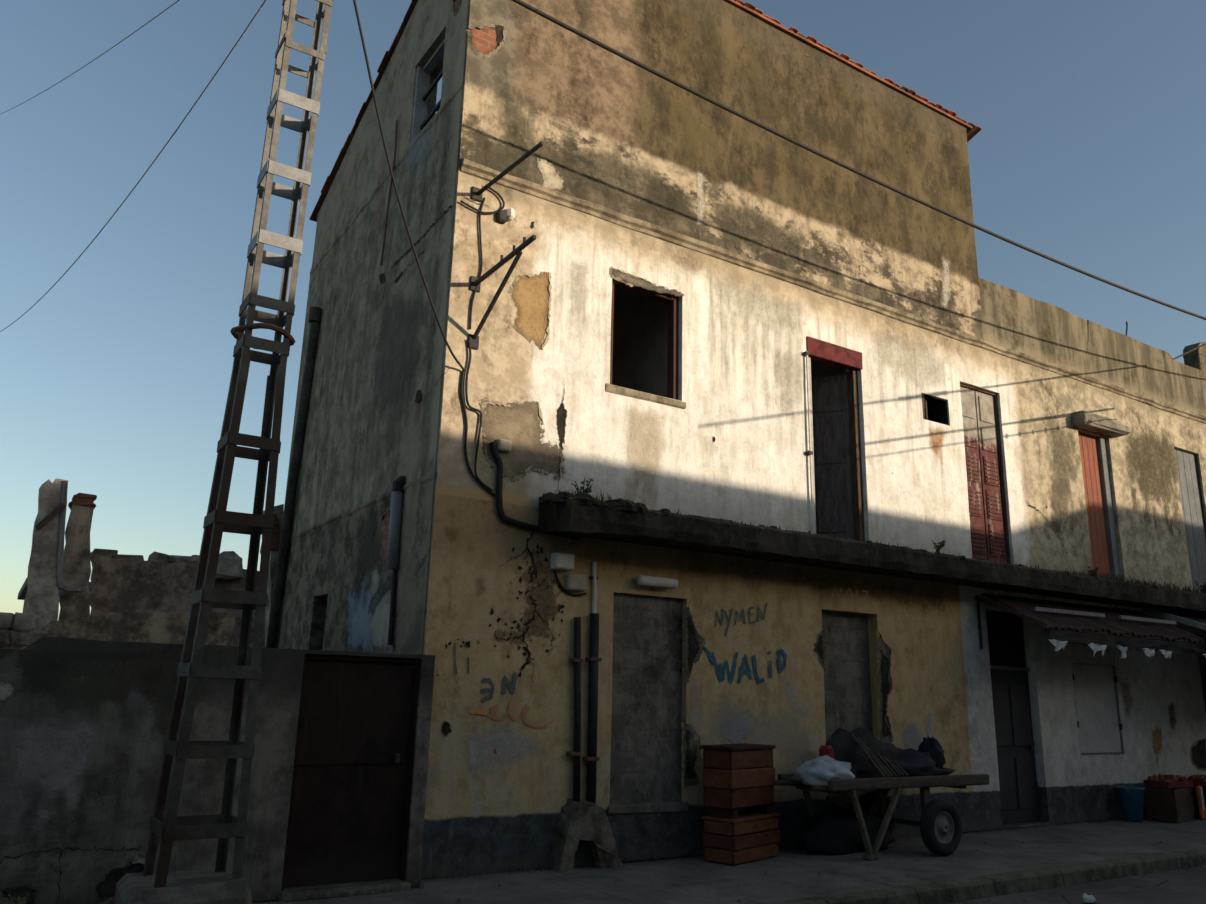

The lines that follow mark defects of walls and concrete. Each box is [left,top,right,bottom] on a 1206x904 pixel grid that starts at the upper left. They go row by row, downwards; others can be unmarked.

spalling [466,23,507,59]
damp [491,96,528,173]
damp [564,145,804,263]
peeling [507,272,552,350]
peeling [478,398,565,483]
peeling [345,507,398,654]
crack [494,531,555,685]
spalling [683,605,706,683]
spalling [1190,738,1206,771]
crack [0,846,145,904]
spalling [96,855,145,904]